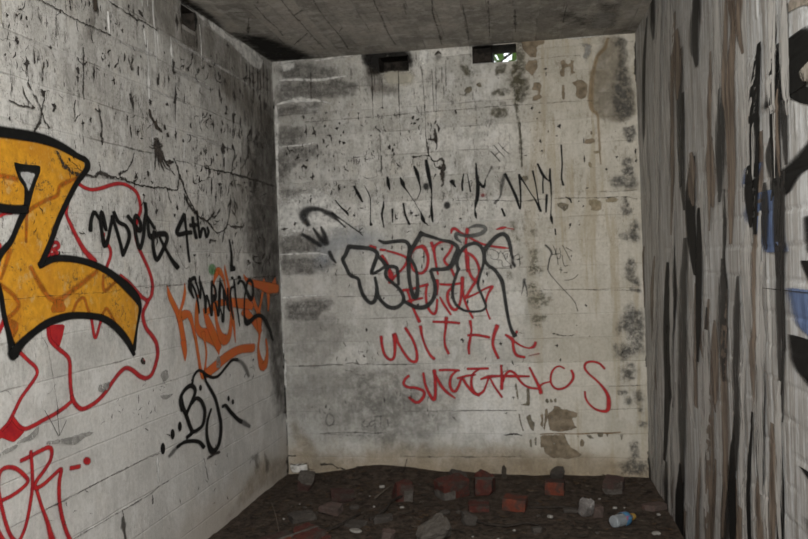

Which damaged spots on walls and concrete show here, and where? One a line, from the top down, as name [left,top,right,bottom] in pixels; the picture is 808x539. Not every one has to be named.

crack [9,82,50,132]
crack [39,0,274,257]
damp [510,42,528,166]
damp [589,30,636,164]
damp [613,158,635,187]
damp [614,307,644,379]
peeling [512,384,608,459]